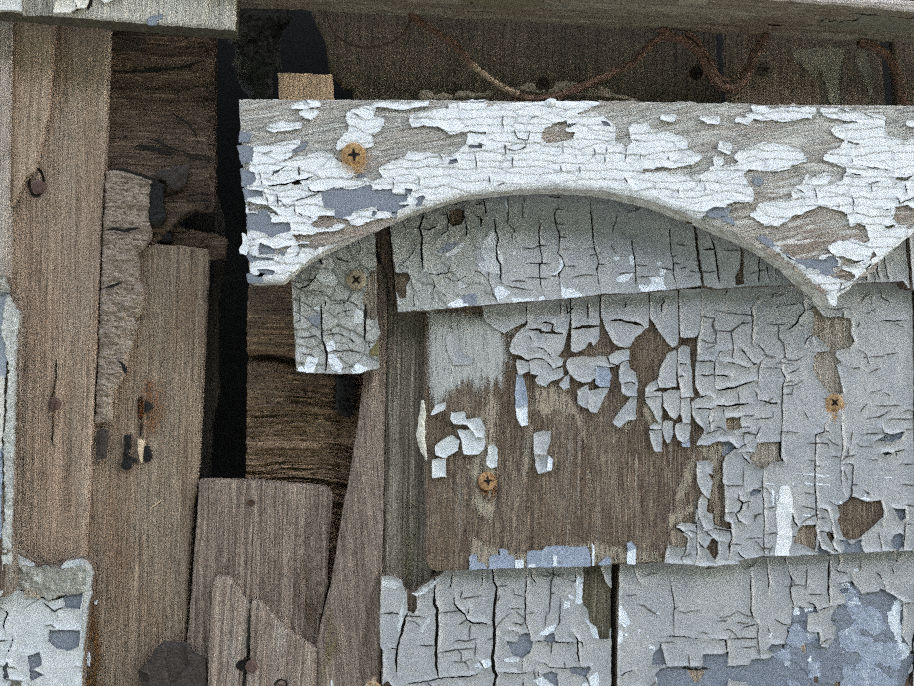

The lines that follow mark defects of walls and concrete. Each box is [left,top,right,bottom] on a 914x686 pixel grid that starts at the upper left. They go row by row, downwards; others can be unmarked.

peeling [239,233,285,283]
crack [293,241,370,374]
peeling [292,211,398,250]
peeling [237,99,493,201]
peeling [596,100,914,294]
peeling [0,295,21,577]
peeling [406,288,731,639]
crack [398,117,914,655]
peeling [794,497,884,550]
crack [384,569,589,686]
crack [681,662,710,671]
crack [906,633,914,683]